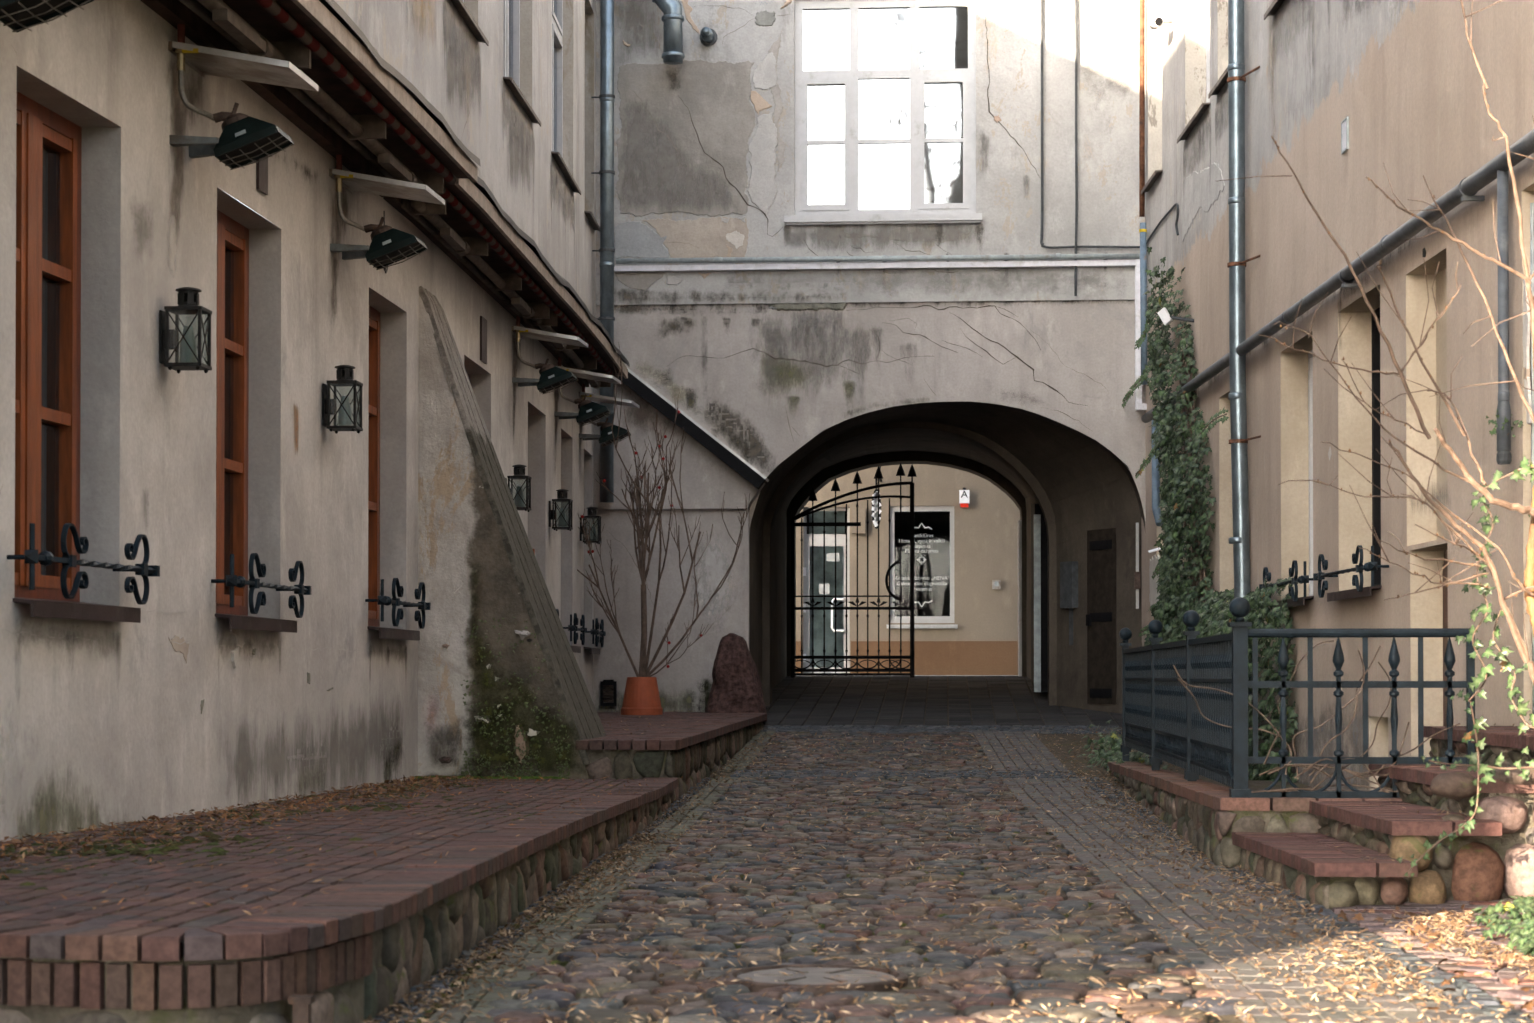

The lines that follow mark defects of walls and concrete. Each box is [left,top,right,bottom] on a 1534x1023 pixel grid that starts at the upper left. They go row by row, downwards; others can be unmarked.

peeling [641,52,778,286]
crack [981,1,1040,177]
mould [686,389,769,468]
water stain [618,282,877,406]
crack [668,99,1108,429]